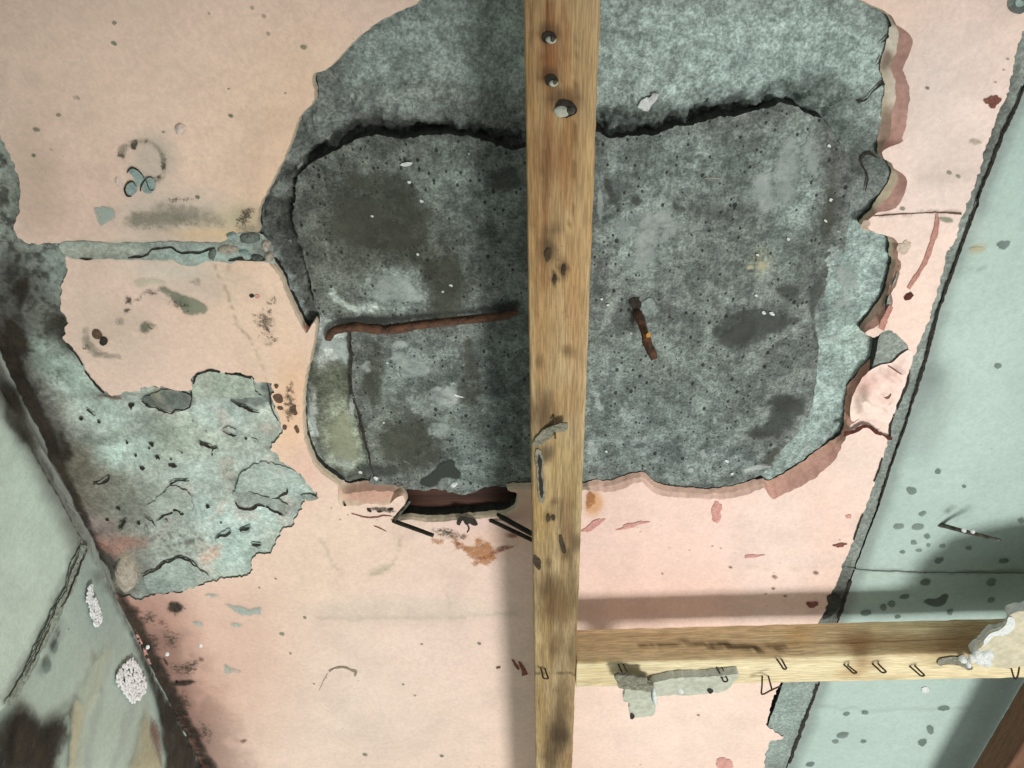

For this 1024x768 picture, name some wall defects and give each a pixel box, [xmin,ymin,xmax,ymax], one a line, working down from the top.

flaking render [256,0,543,533]
damp [373,259,460,319]
flaking render [582,0,913,523]
rust [325,310,519,341]
rust [629,297,658,361]
damp [715,309,797,348]
peeling [0,135,319,705]
crack [349,332,375,476]
rust [432,528,516,566]
flaking render [833,514,864,548]
damp [86,583,103,627]
damp [116,591,216,768]